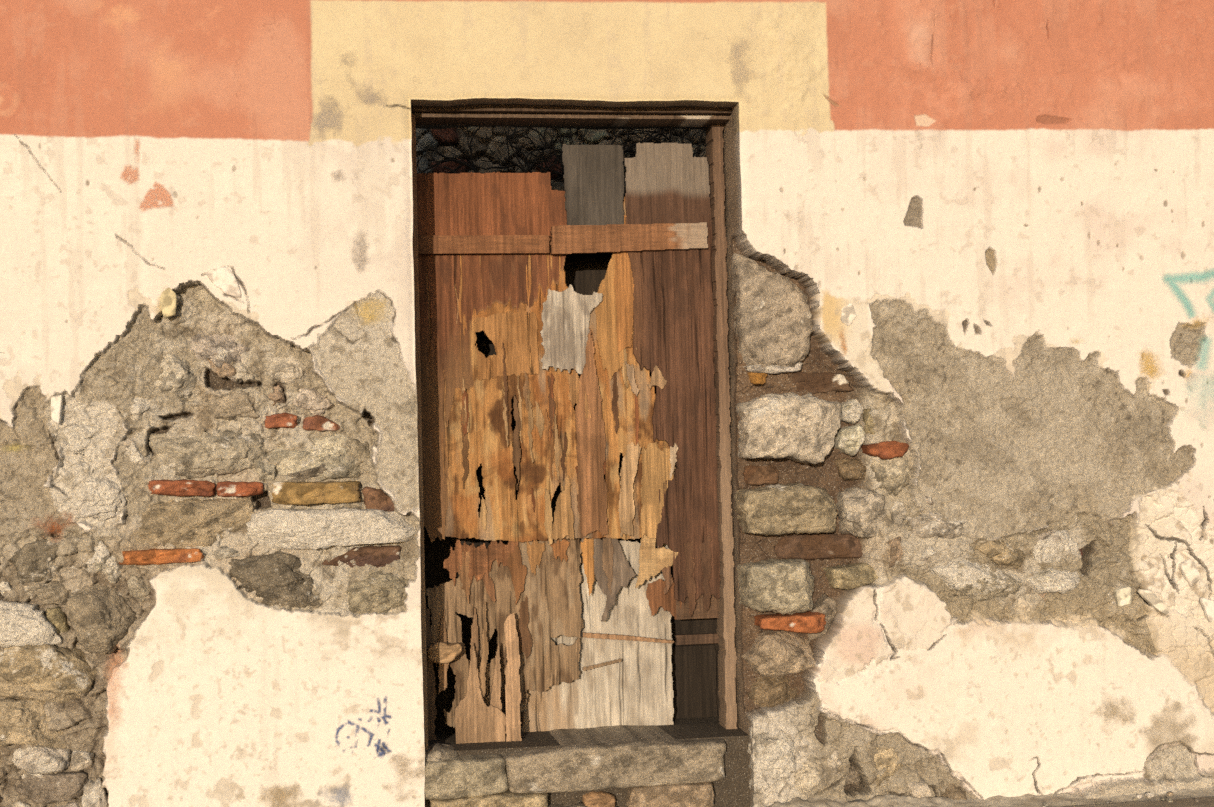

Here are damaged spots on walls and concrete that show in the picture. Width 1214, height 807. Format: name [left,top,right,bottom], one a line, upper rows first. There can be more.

spalling [903,195,924,229]
spalling [0,267,420,807]
spalling [730,227,1214,807]
crack [1124,506,1214,657]
crack [1029,740,1214,795]